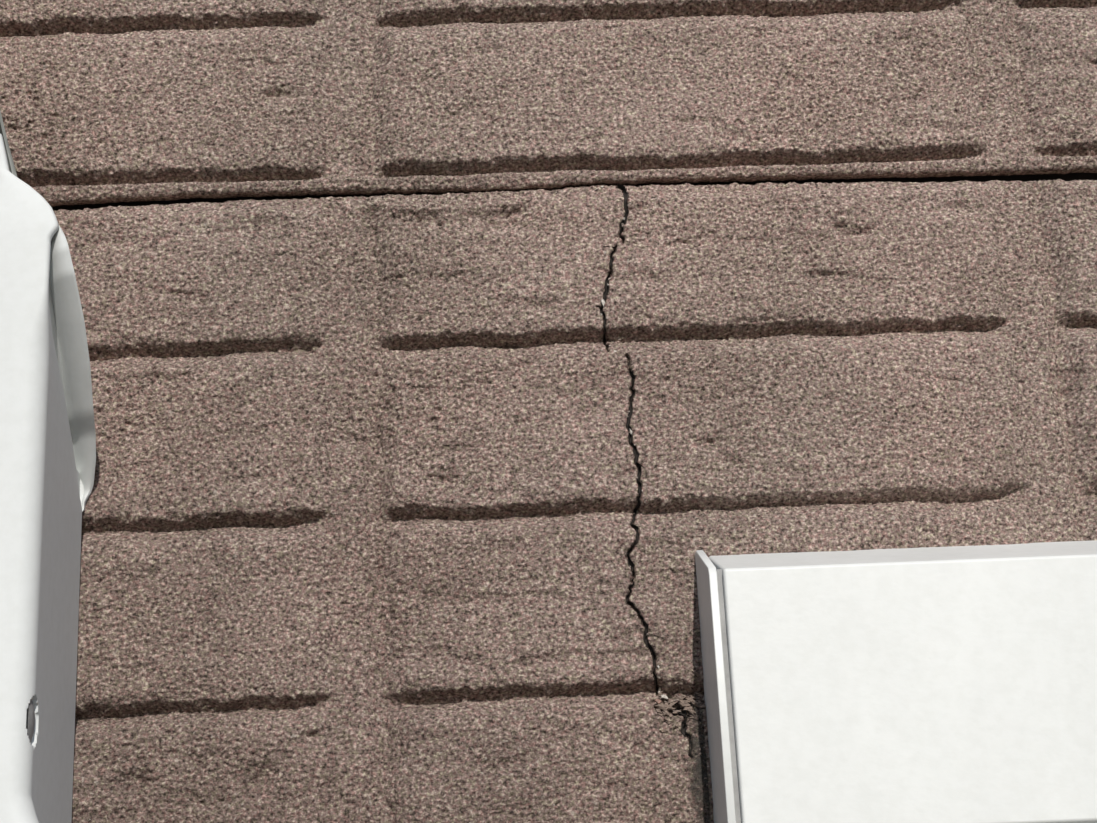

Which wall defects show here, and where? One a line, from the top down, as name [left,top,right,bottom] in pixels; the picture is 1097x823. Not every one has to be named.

crack [594,184,699,758]